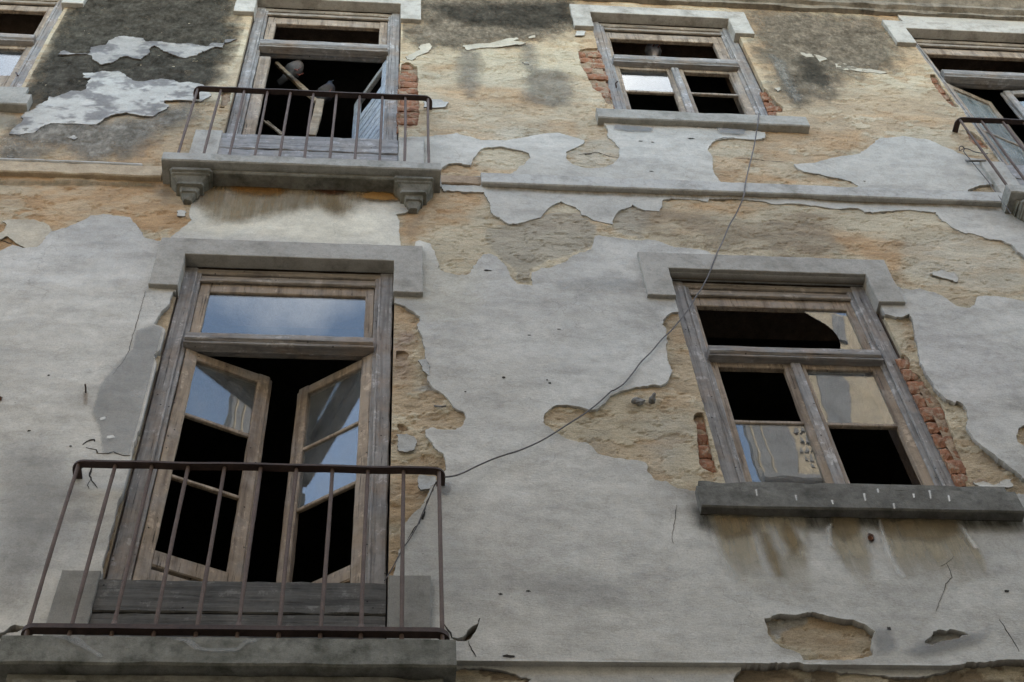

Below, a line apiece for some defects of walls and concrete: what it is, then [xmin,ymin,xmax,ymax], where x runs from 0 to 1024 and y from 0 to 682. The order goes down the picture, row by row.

peeling [0,0,253,251]
water stain [403,0,580,50]
peeling [396,0,999,187]
water stain [748,9,900,106]
peeling [397,188,1024,308]
peeling [388,305,465,579]
peeling [544,314,725,491]
peeling [882,317,1024,494]
spalling [734,617,1024,682]